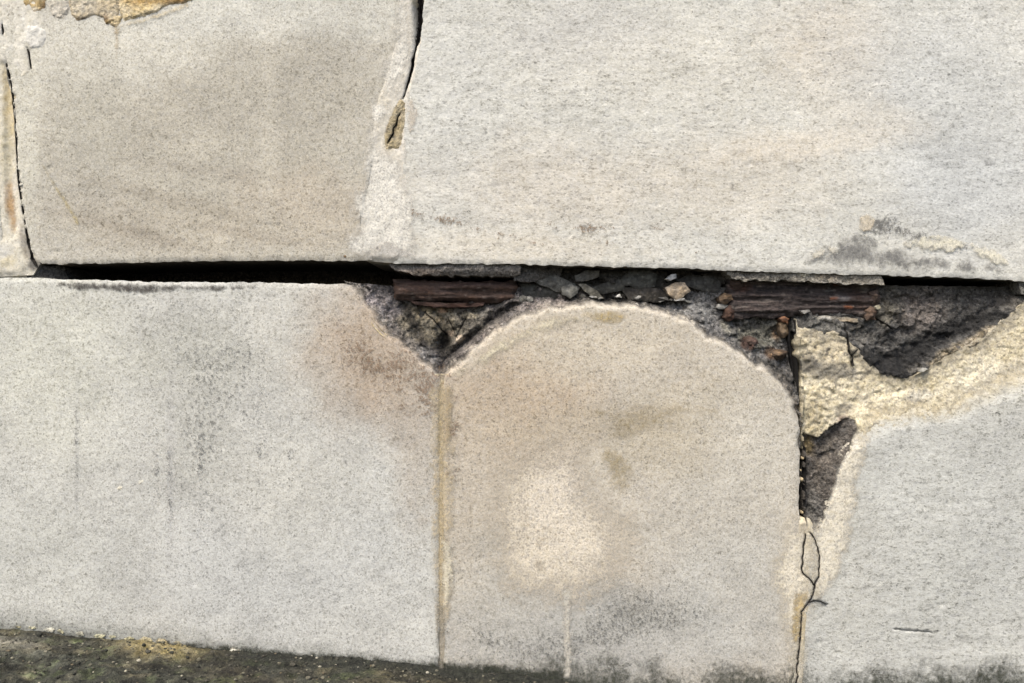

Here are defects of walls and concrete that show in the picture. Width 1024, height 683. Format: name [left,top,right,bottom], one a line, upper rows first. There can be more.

peeling [23,0,191,33]
crack [388,0,424,142]
spalling [347,269,1024,530]
crack [786,320,827,683]